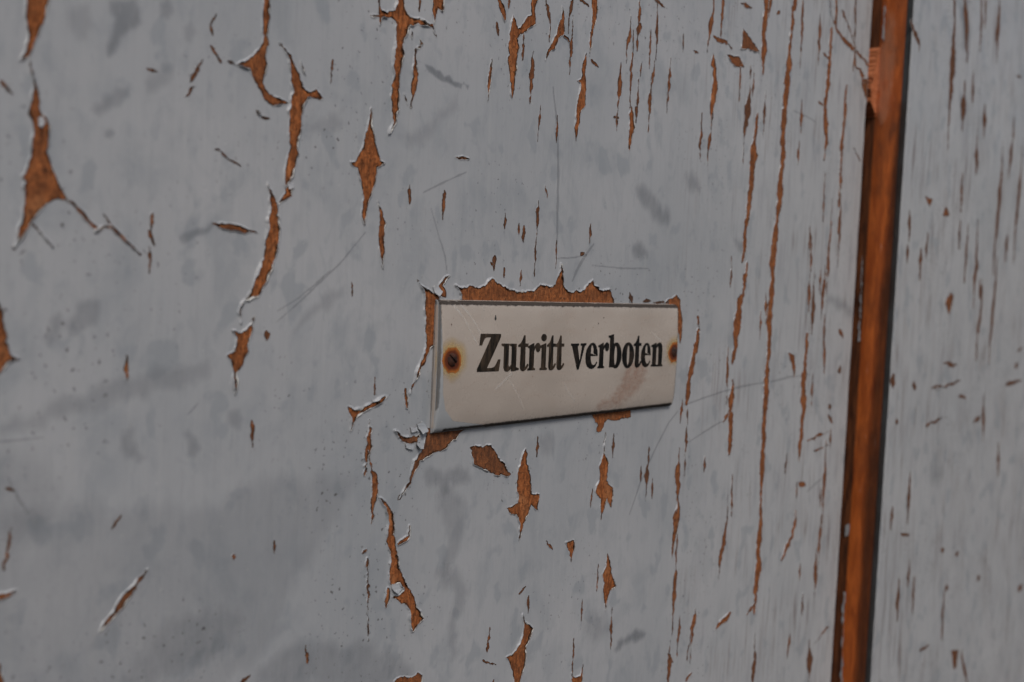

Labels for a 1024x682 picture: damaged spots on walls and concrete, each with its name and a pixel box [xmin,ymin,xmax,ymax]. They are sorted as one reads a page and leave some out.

peeling [497,0,539,100]
peeling [12,0,142,257]
peeling [348,0,445,270]
peeling [210,0,324,397]
peeling [0,301,22,375]
peeling [403,261,614,410]
peeling [346,394,389,433]
peeling [378,421,466,634]
peeling [469,443,540,542]
peeling [590,410,631,520]
peeling [98,567,149,634]
peeling [505,612,534,682]